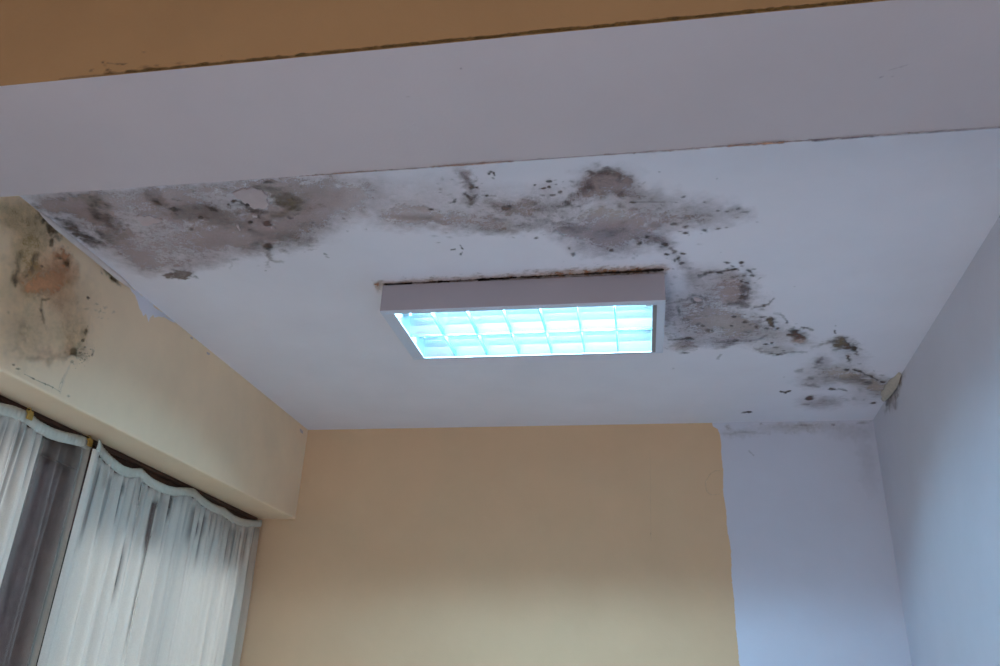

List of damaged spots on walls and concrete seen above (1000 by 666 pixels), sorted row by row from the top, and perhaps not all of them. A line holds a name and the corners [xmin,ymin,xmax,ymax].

damp [13,175,368,311]
damp [383,179,543,232]
damp [534,168,719,264]
damp [667,261,809,354]
damp [816,330,885,404]